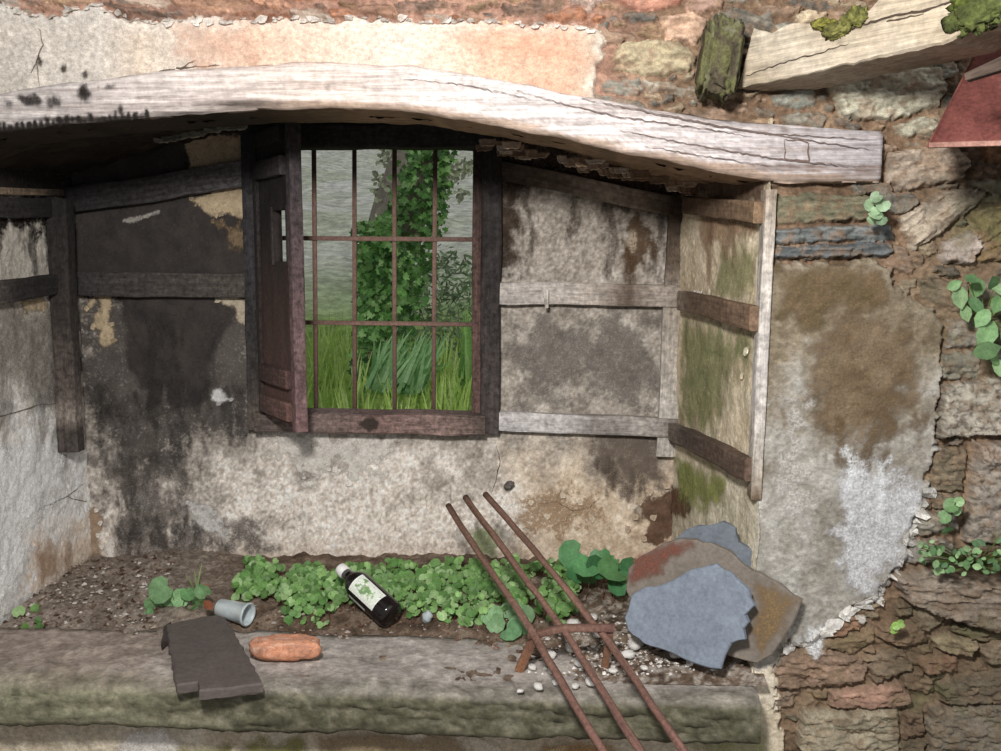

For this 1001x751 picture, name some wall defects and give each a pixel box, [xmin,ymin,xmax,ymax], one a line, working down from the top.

water stain [28,225,48,273]
peeling [189,187,243,250]
peeling [84,296,118,347]
water stain [765,263,928,594]
water stain [107,444,203,553]
spalling [783,487,937,655]
water stain [807,627,823,657]